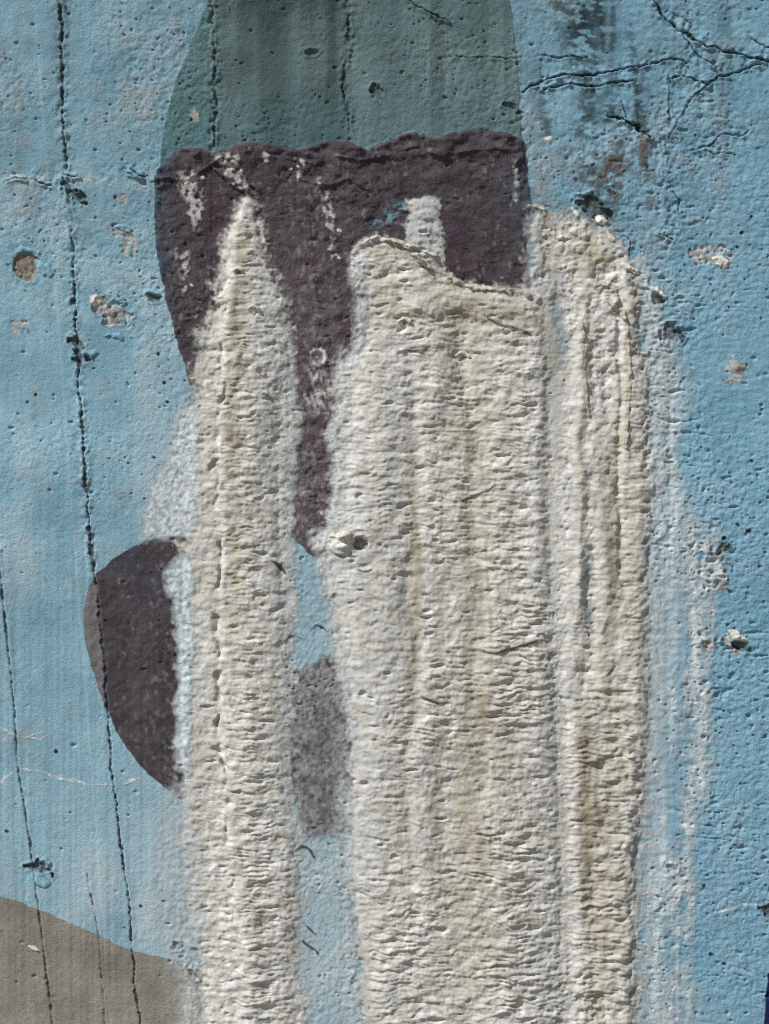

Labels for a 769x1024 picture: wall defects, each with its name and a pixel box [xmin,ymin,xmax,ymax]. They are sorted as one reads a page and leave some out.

crack [530,12,769,137]
spalling [13,245,55,281]
spalling [688,243,733,273]
spalling [90,295,134,341]
spalling [722,356,749,385]
spalling [688,625,752,659]